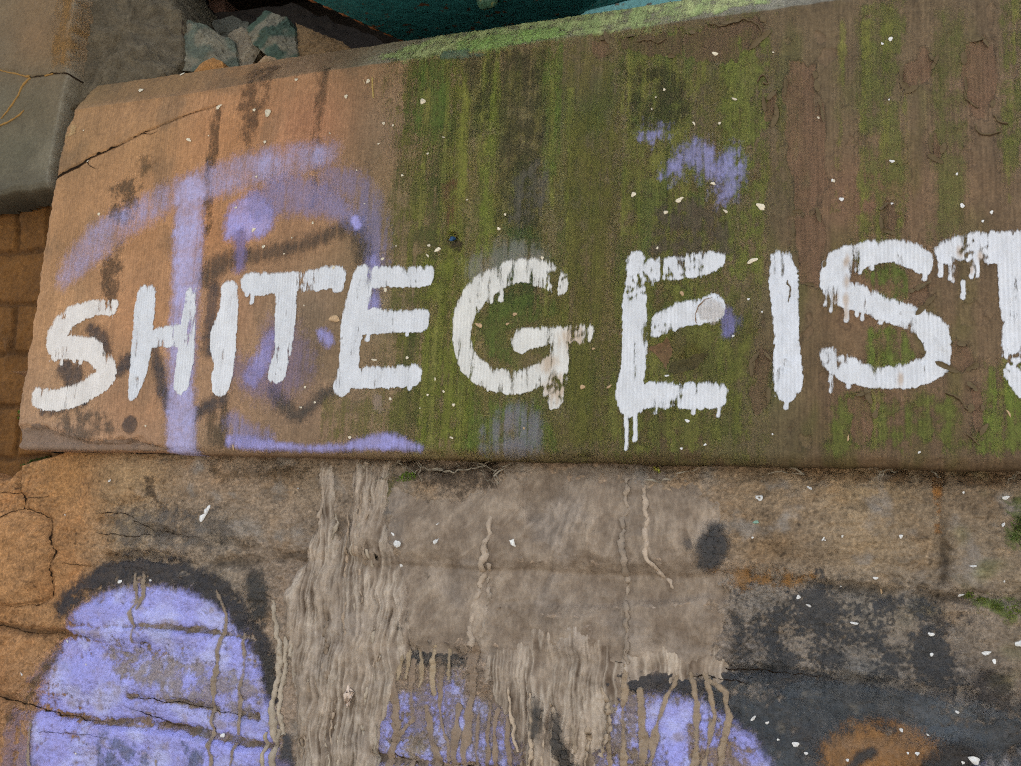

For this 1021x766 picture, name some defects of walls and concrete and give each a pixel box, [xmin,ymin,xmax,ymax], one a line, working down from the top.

crack [56,105,217,180]
water stain [650,198,735,264]
water stain [407,460,500,496]
crack [0,475,92,639]
water stain [385,641,513,766]
water stain [606,664,733,766]